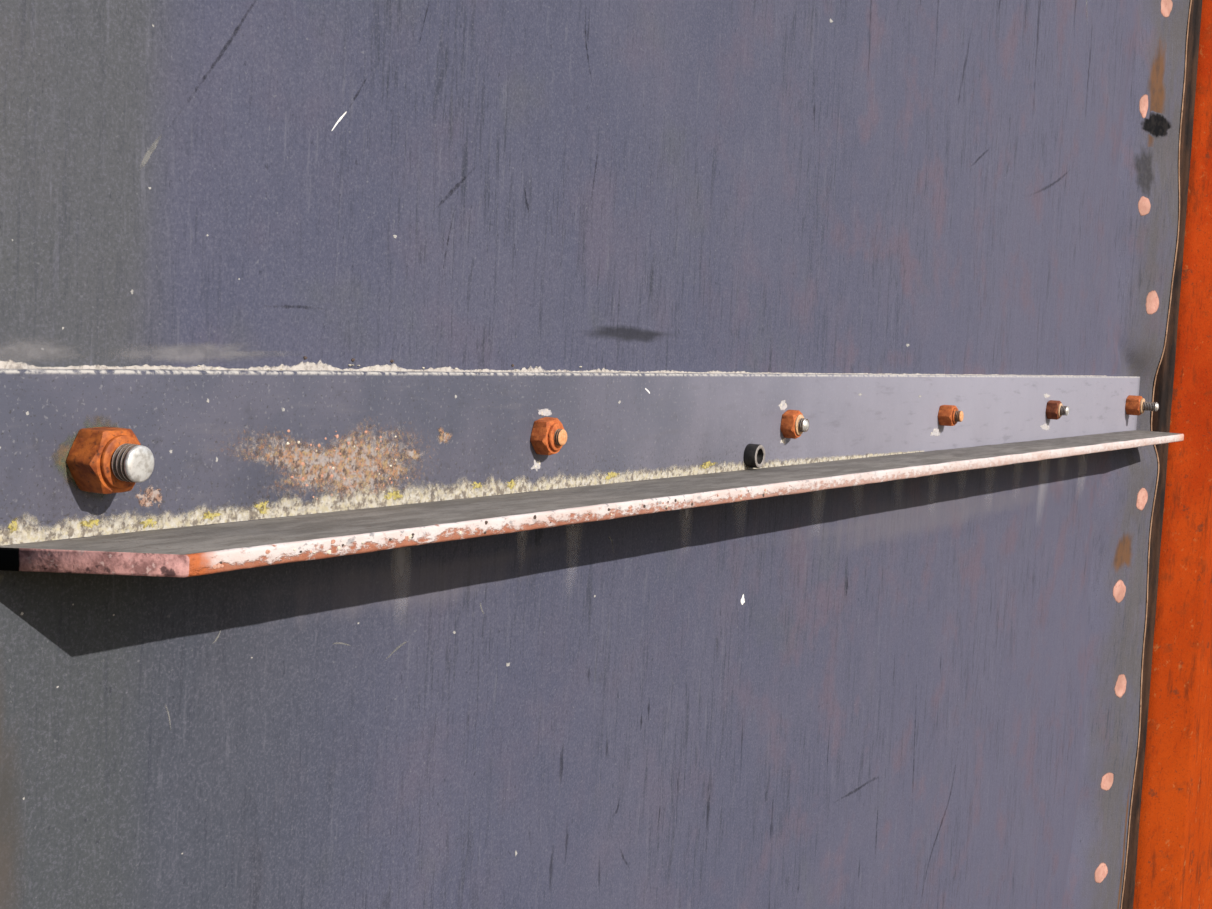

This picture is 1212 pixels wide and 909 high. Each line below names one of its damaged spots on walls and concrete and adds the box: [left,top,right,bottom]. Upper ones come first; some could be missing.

corrosion [136,487,162,507]
corrosion [240,430,421,500]